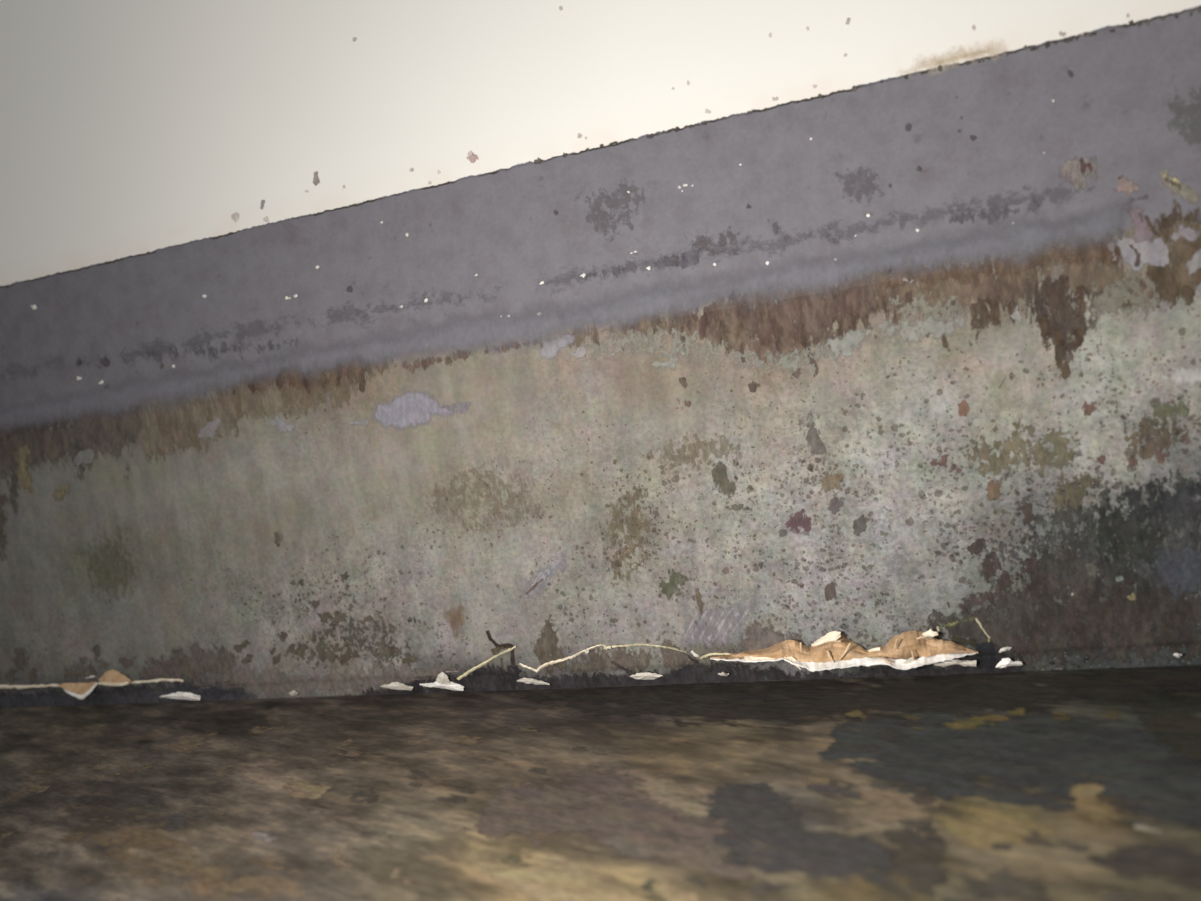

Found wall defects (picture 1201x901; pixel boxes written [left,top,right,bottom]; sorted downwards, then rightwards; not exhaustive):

corrosion [569,199,1201,378]
peeling [1091,175,1201,321]
damp [927,469,1201,667]
peeling [0,670,201,700]
peeling [420,646,516,691]
peeling [517,629,979,685]